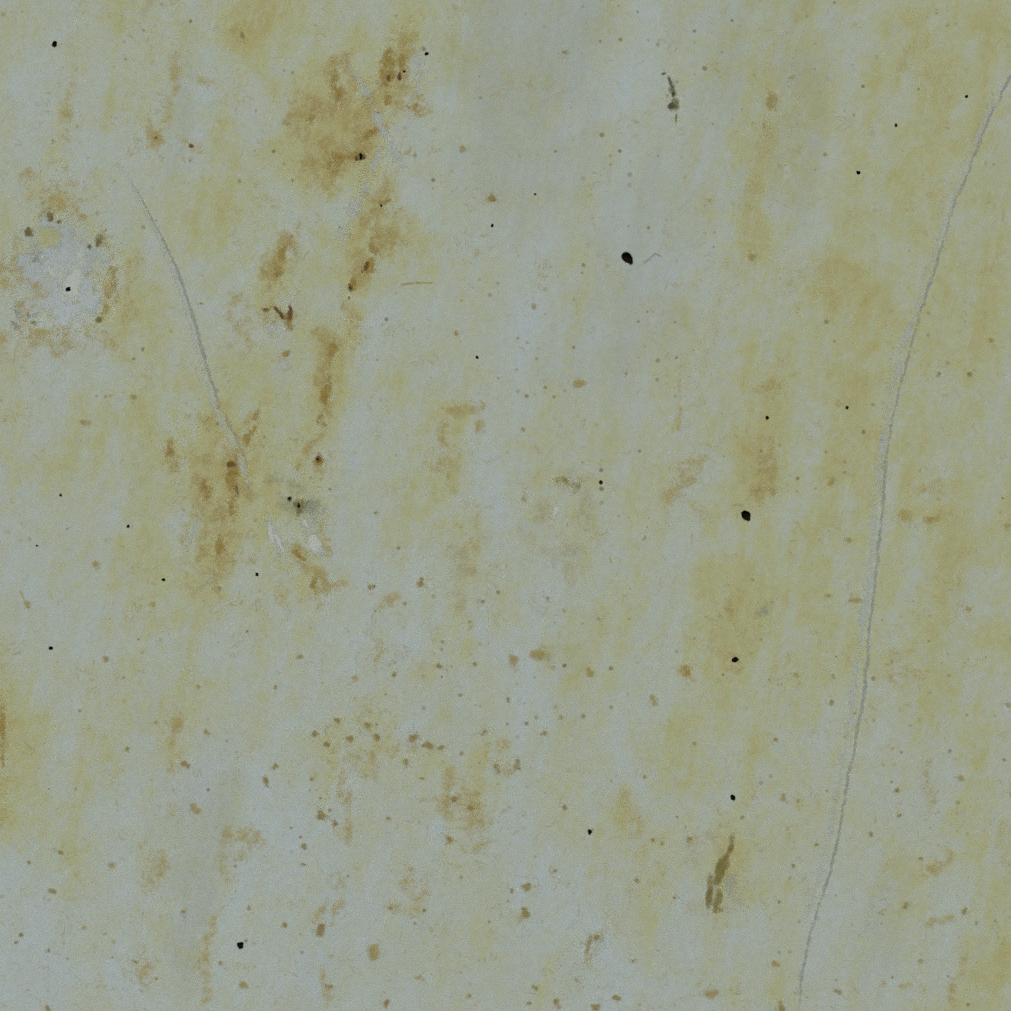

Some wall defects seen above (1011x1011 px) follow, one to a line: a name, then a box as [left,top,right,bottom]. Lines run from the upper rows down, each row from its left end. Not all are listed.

corrosion [285,52,376,195]
corrosion [364,32,422,116]
crack [799,75,1011,1003]